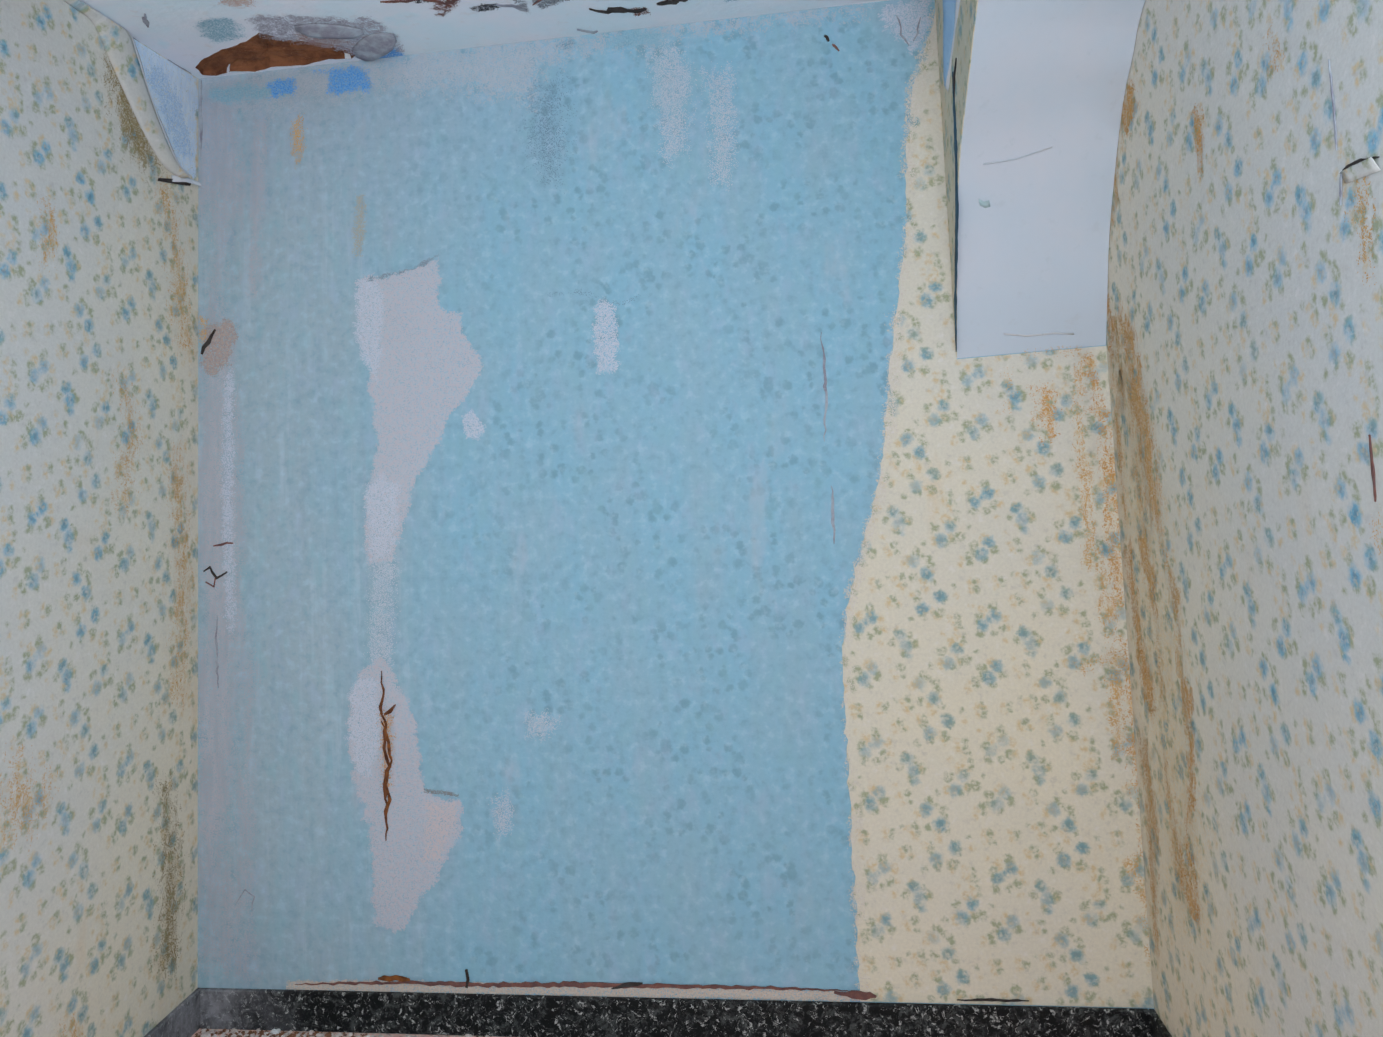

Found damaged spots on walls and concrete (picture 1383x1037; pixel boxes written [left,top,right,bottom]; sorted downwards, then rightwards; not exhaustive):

spalling [198,315,241,377]
peeling [547,289,639,375]
crack [376,671,396,840]
peeling [344,655,465,934]
flaking render [286,969,876,1002]